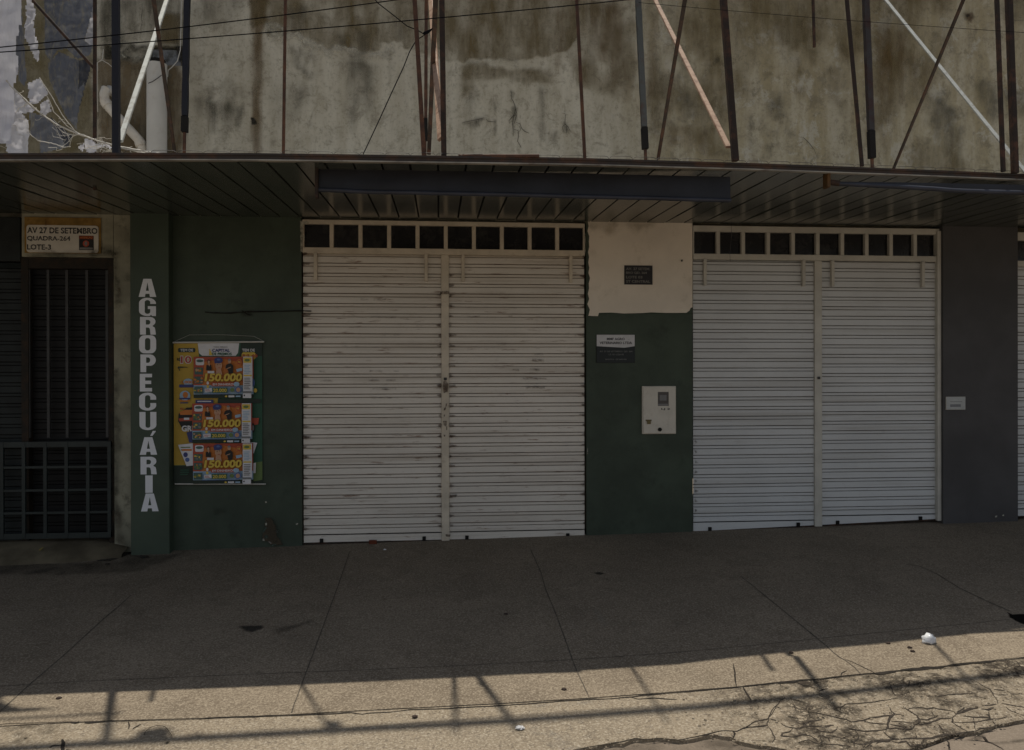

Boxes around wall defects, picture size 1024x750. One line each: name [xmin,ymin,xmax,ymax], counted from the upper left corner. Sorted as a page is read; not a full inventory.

damp [342,0,377,51]
damp [429,0,548,91]